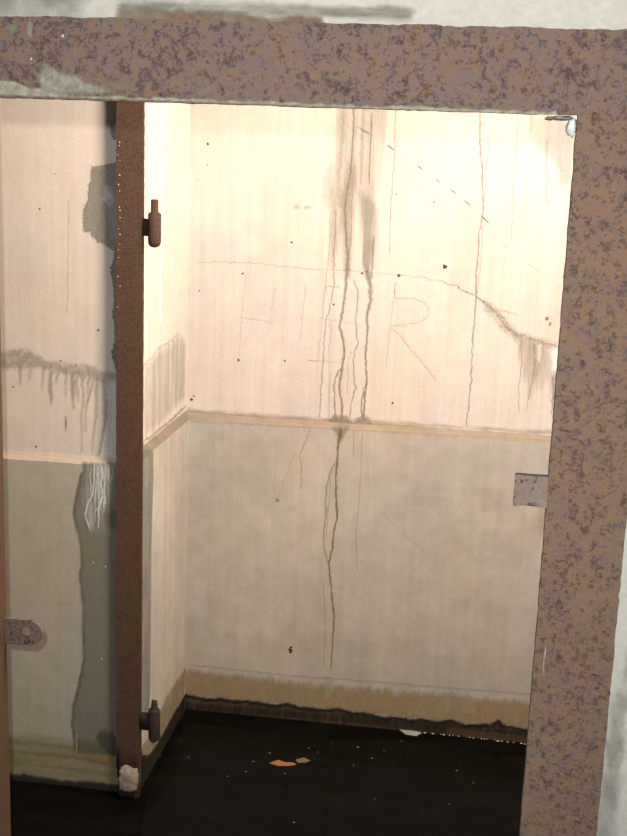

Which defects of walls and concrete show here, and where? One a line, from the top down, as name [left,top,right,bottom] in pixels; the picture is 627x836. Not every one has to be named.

rust [119,11,322,22]
peeling [82,162,121,368]
crack [323,109,374,666]
leakage [529,339,558,386]
leakage [1,351,118,792]
leakage [140,670,529,788]